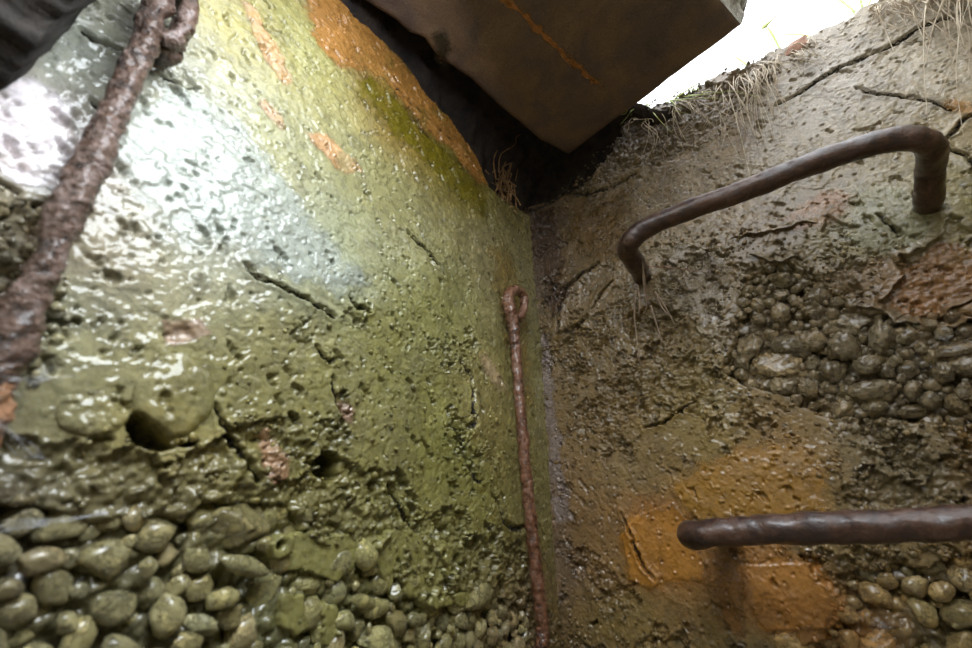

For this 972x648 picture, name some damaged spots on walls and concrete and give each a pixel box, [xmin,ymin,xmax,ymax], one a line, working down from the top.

corrosion [307,0,488,185]
crack [778,11,964,105]
crack [856,89,972,165]
corrosion [0,0,200,446]
crack [878,215,899,237]
peeling [886,217,948,263]
crack [244,264,368,319]
spalling [717,252,972,426]
corrosion [619,439,830,592]
spalling [0,502,530,648]
corrosion [743,555,841,635]
spalling [774,552,972,648]